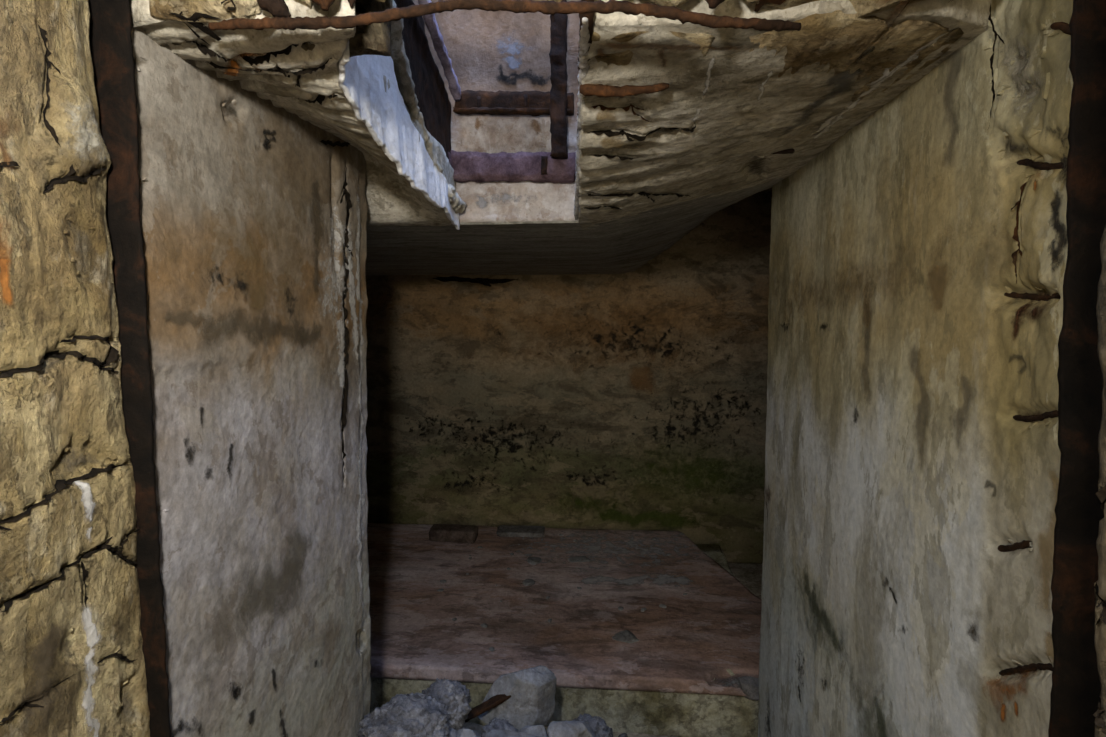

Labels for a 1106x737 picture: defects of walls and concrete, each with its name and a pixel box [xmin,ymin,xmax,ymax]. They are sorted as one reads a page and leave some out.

crack [38,20,106,194]
spalling [208,0,801,220]
crack [588,104,696,160]
peeling [990,24,1061,110]
crack [0,335,122,378]
damp [570,317,703,367]
rust [1012,304,1047,338]
damp [406,410,586,492]
damp [633,388,760,455]
crack [0,464,123,530]
crack [0,527,140,613]
rust [1039,514,1056,606]